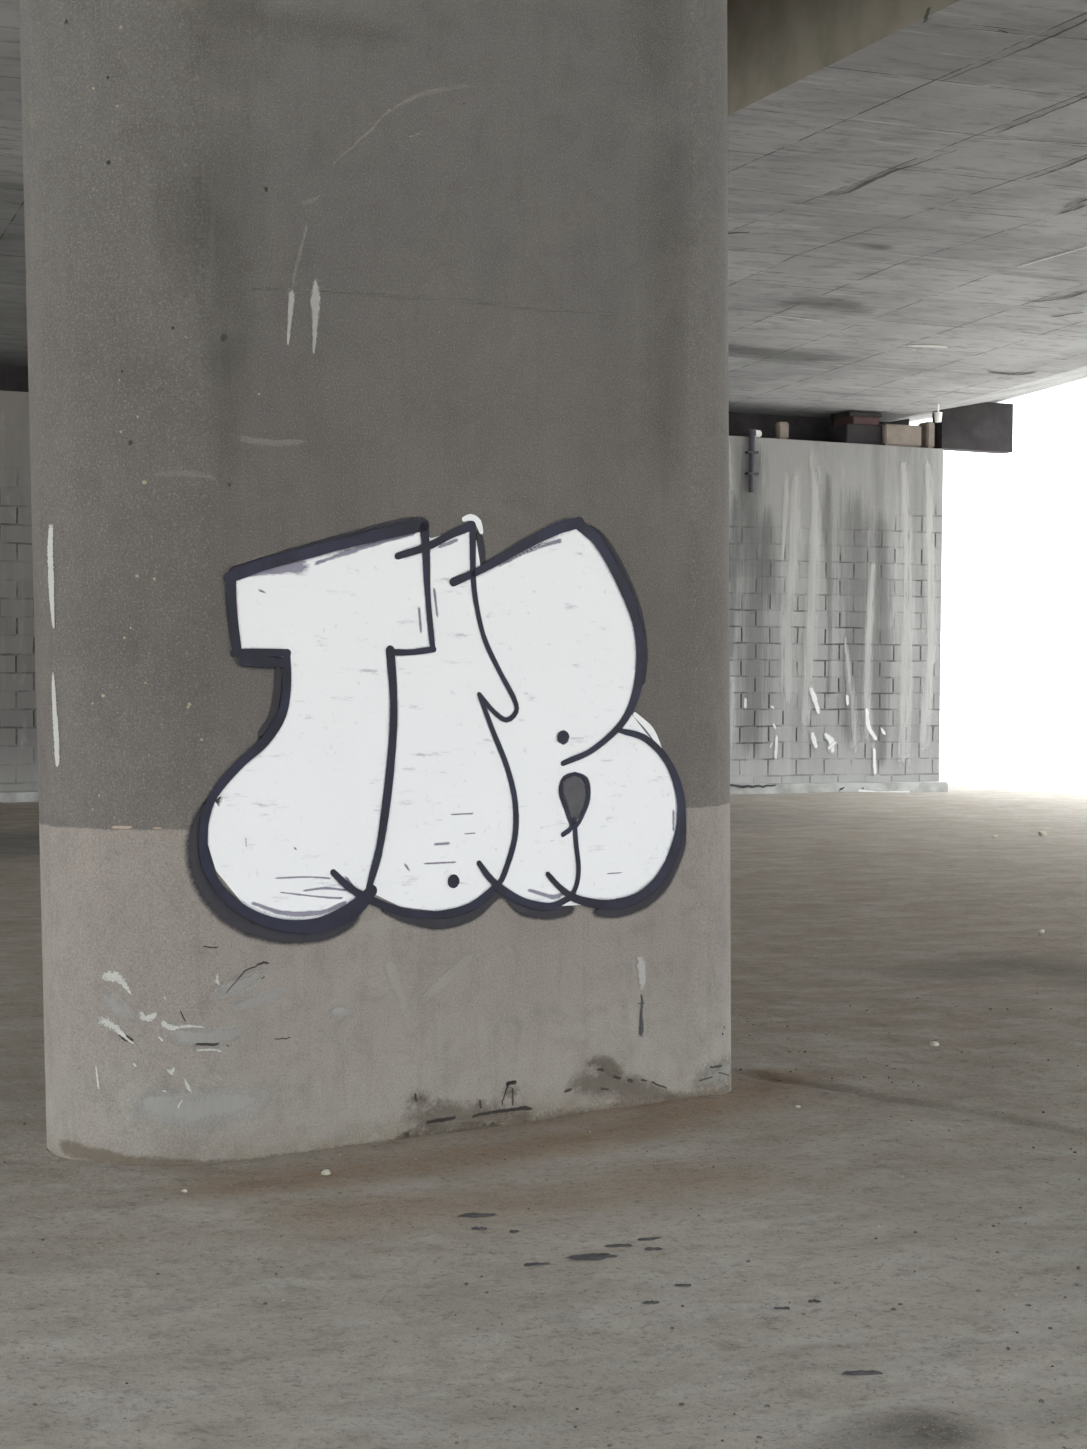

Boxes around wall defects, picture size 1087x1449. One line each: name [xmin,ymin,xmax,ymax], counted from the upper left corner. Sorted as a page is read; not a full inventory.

crack [924,7,1087,81]
crack [825,96,1087,195]
crack [1061,199,1087,213]